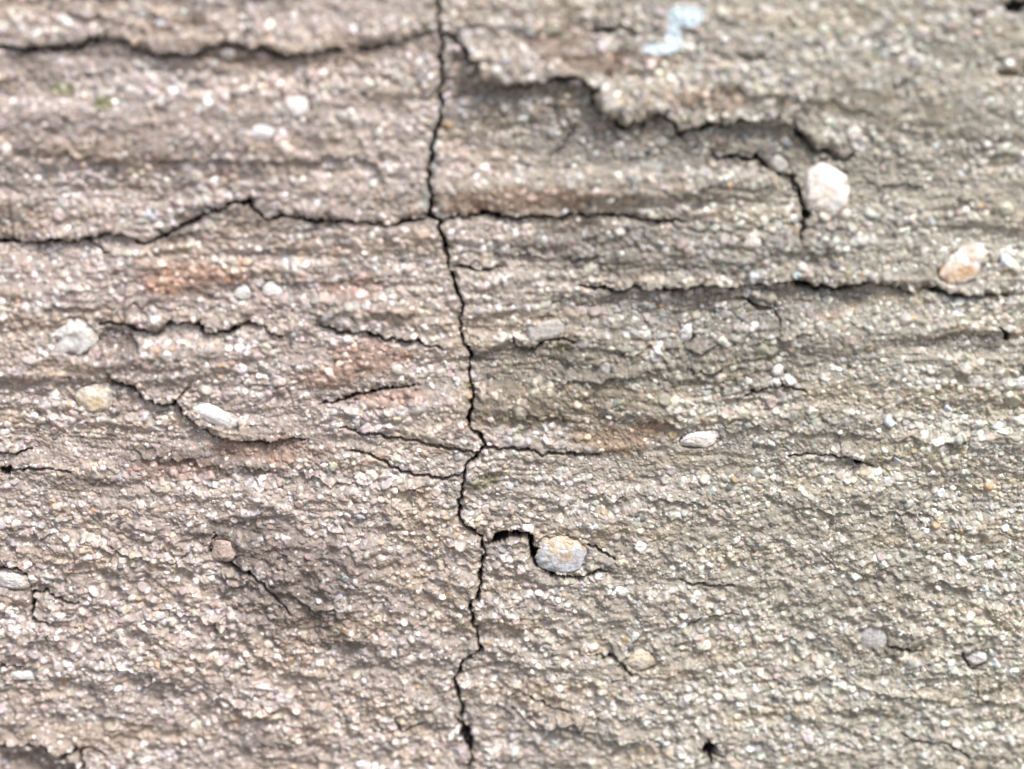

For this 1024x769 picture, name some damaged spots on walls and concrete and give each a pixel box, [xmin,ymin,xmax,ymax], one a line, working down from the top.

crack [506,76,750,135]
crack [791,122,850,156]
crack [711,153,805,239]
crack [580,280,867,307]
crack [1,0,634,766]